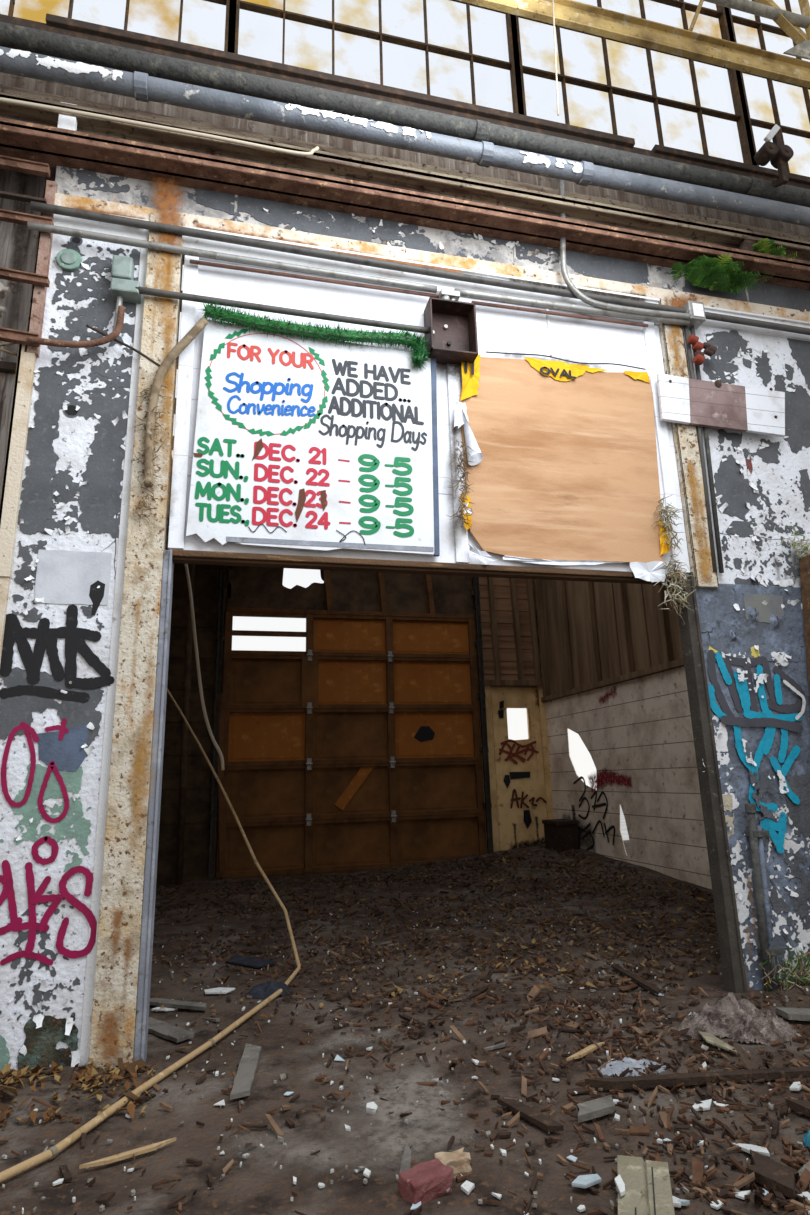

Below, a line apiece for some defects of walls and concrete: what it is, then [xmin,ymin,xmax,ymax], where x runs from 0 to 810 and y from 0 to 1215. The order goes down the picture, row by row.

corrosion [153,176,182,436]
peeling [194,188,445,253]
corrosion [196,224,461,273]
corrosion [511,278,645,302]
corrosion [666,296,697,308]
peeling [12,237,140,631]
corrosion [688,461,709,580]
peeling [703,330,810,623]
peeling [0,891,81,1071]
peeling [0,667,107,873]
corrosion [114,911,130,967]
peeling [702,715,810,988]